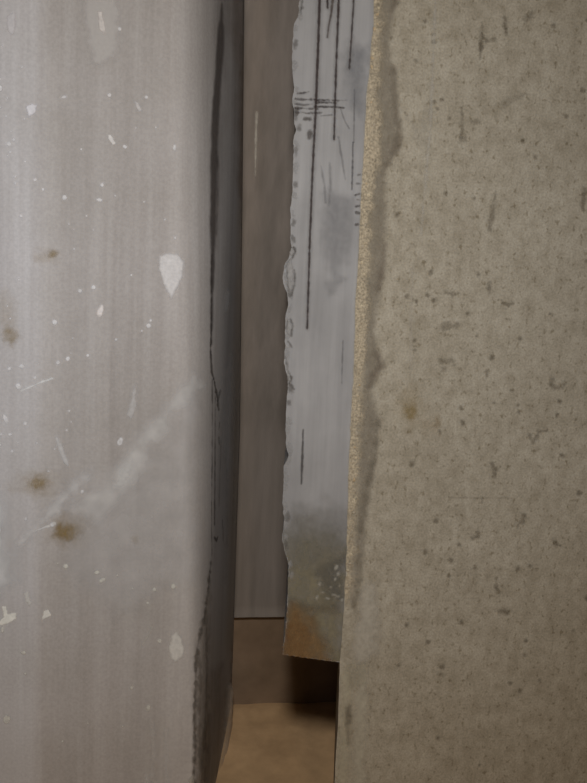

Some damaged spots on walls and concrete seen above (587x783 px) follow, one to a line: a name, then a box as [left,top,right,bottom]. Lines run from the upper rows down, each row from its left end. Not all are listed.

peeling [159,254,183,297]
peeling [0,606,16,625]
peeling [169,632,184,661]